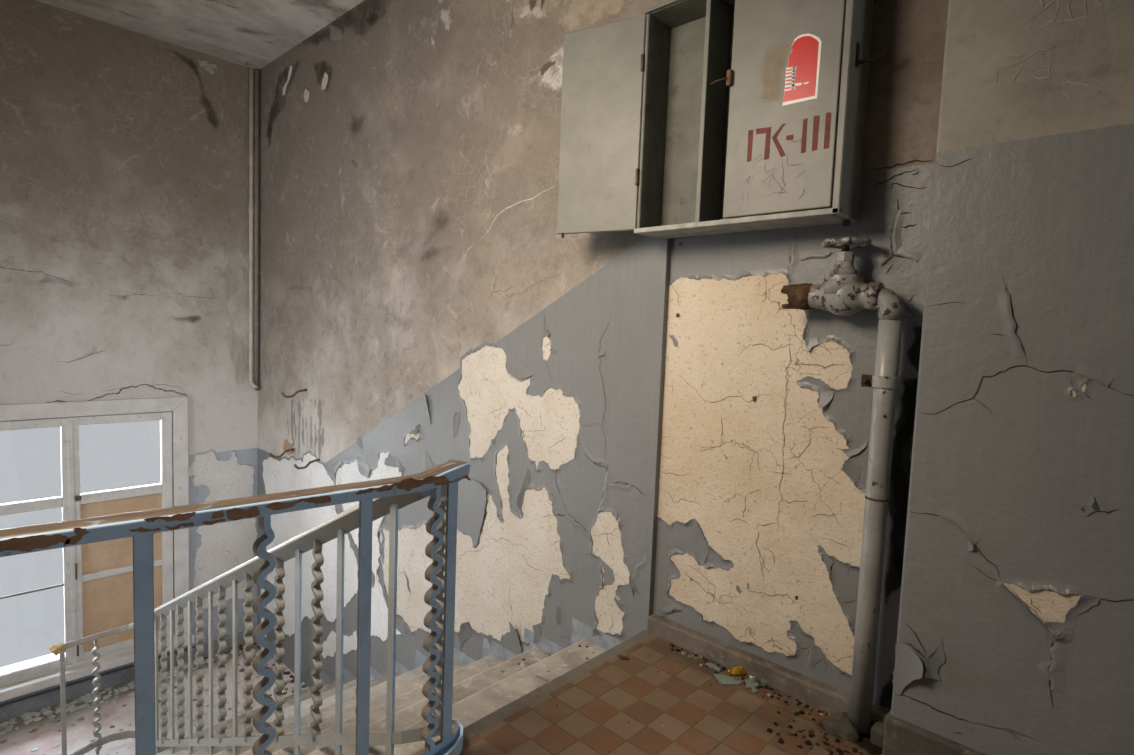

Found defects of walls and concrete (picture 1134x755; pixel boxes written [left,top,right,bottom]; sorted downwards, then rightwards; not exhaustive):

peeling [506,0,625,32]
spalling [303,72,328,102]
peeling [129,315,584,661]
peeling [657,268,867,679]
peeling [0,528,90,552]
peeling [588,505,634,639]
crack [914,507,1001,581]
spalling [994,574,1100,644]